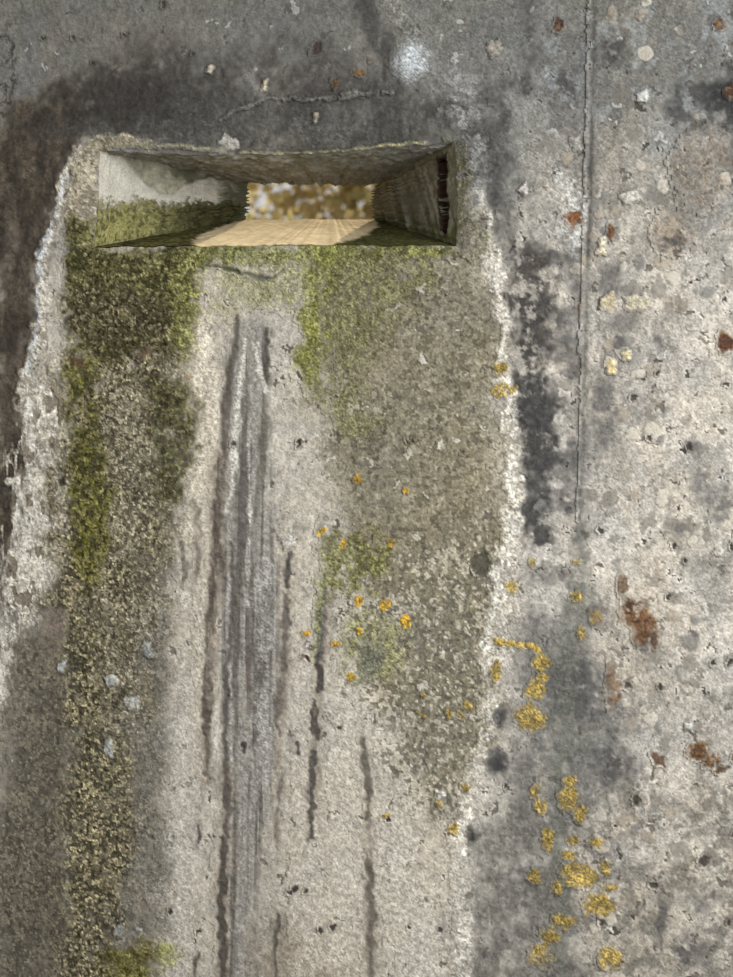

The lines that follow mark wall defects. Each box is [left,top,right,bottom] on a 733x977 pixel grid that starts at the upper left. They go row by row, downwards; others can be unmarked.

damp [7,0,495,209]
crack [109,88,429,155]
damp [660,47,733,146]
rust [648,118,733,262]
damp [0,33,85,712]
damp [447,0,651,977]
damp [672,434,733,538]
damp [162,312,445,977]
rust [603,660,625,716]
rust [587,572,662,651]
rust [684,739,733,776]
damp [644,881,733,977]